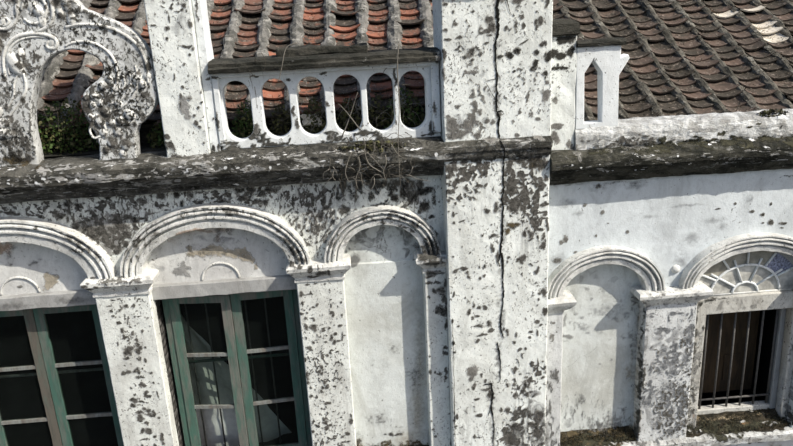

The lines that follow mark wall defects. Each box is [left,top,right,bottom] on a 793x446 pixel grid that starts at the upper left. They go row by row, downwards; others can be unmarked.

peeling [0,0,112,171]
peeling [148,0,200,41]
peeling [0,50,672,446]
crack [484,0,510,445]
peeling [435,0,576,145]
peeling [702,138,793,164]
peeling [631,309,702,446]